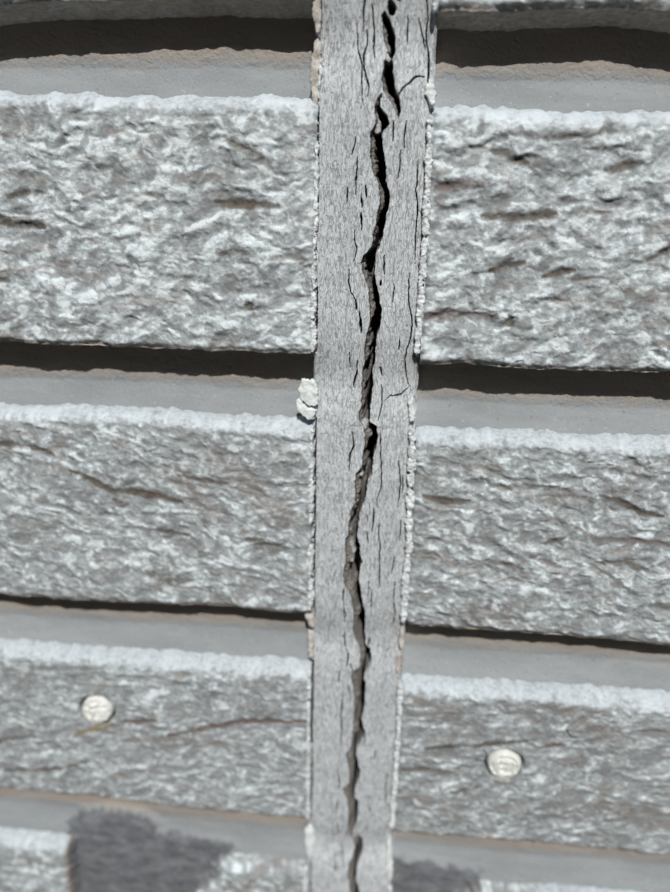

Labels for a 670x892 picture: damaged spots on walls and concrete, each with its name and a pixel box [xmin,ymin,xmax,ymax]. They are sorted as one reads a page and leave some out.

crack [334,0,429,892]